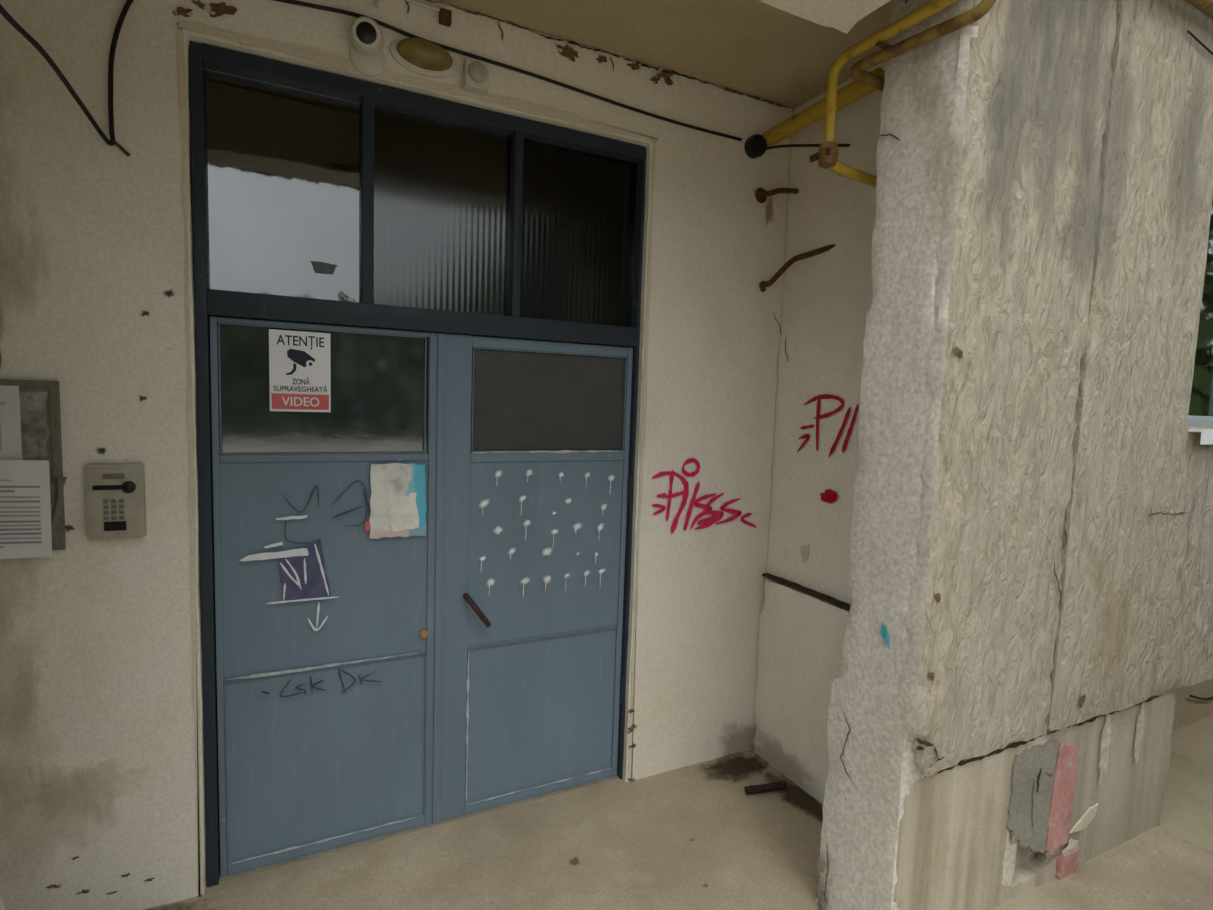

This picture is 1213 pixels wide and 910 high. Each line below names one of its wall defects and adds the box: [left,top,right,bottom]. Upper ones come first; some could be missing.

crack [925,695,1162,777]
spalling [1011,803,1099,868]